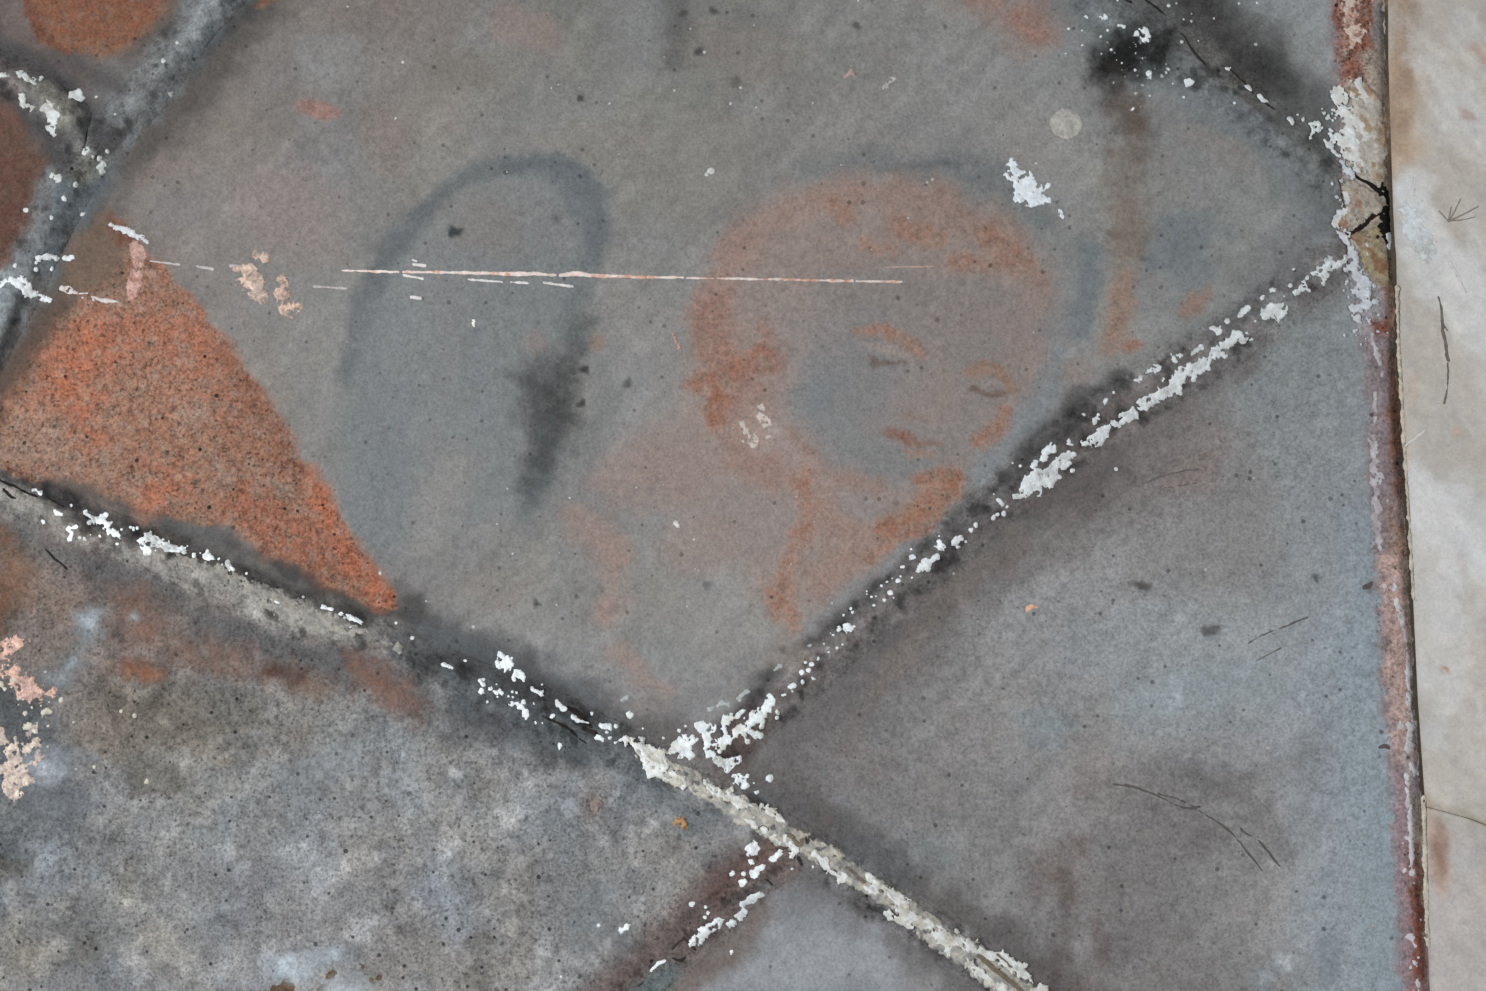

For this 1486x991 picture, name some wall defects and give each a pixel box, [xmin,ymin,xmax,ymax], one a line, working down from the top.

water stain [1091,30,1170,126]
crack [1125,0,1275,110]
flaking render [232,249,303,319]
crack [1346,0,1425,802]
crack [1438,296,1450,404]
water stain [44,611,99,688]
flaking render [0,635,64,802]